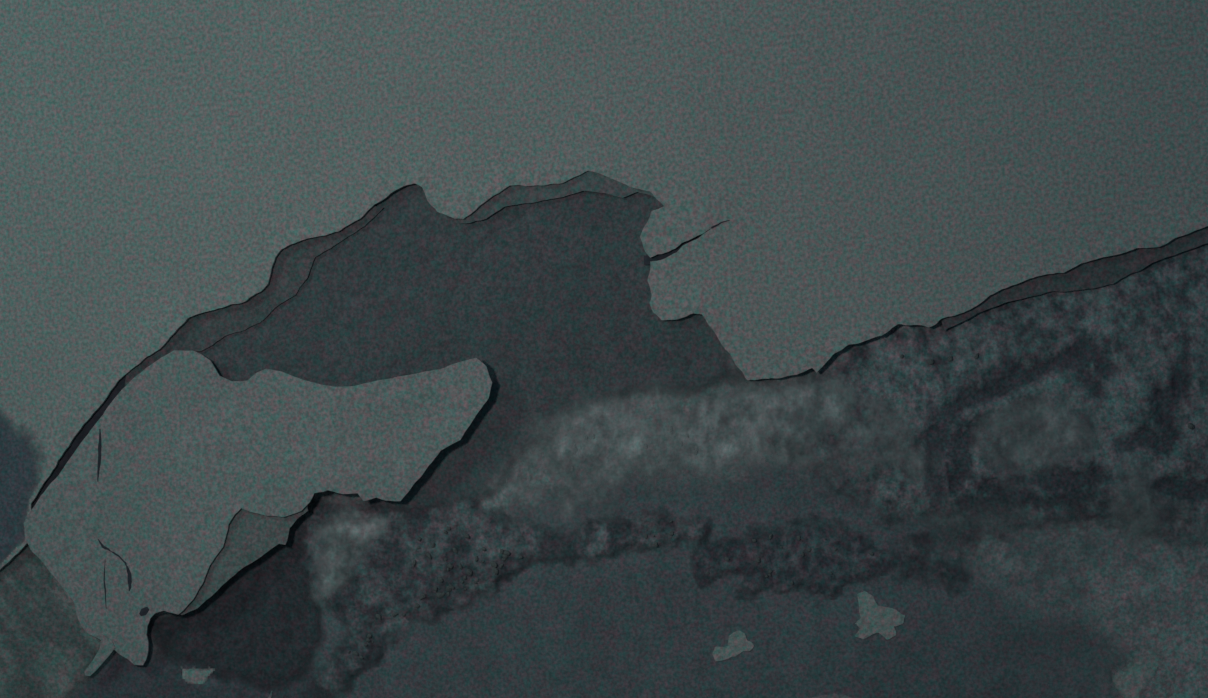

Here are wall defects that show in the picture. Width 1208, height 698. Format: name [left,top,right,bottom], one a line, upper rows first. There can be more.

flaking render [24,171,1208,698]
crack [644,220,730,265]